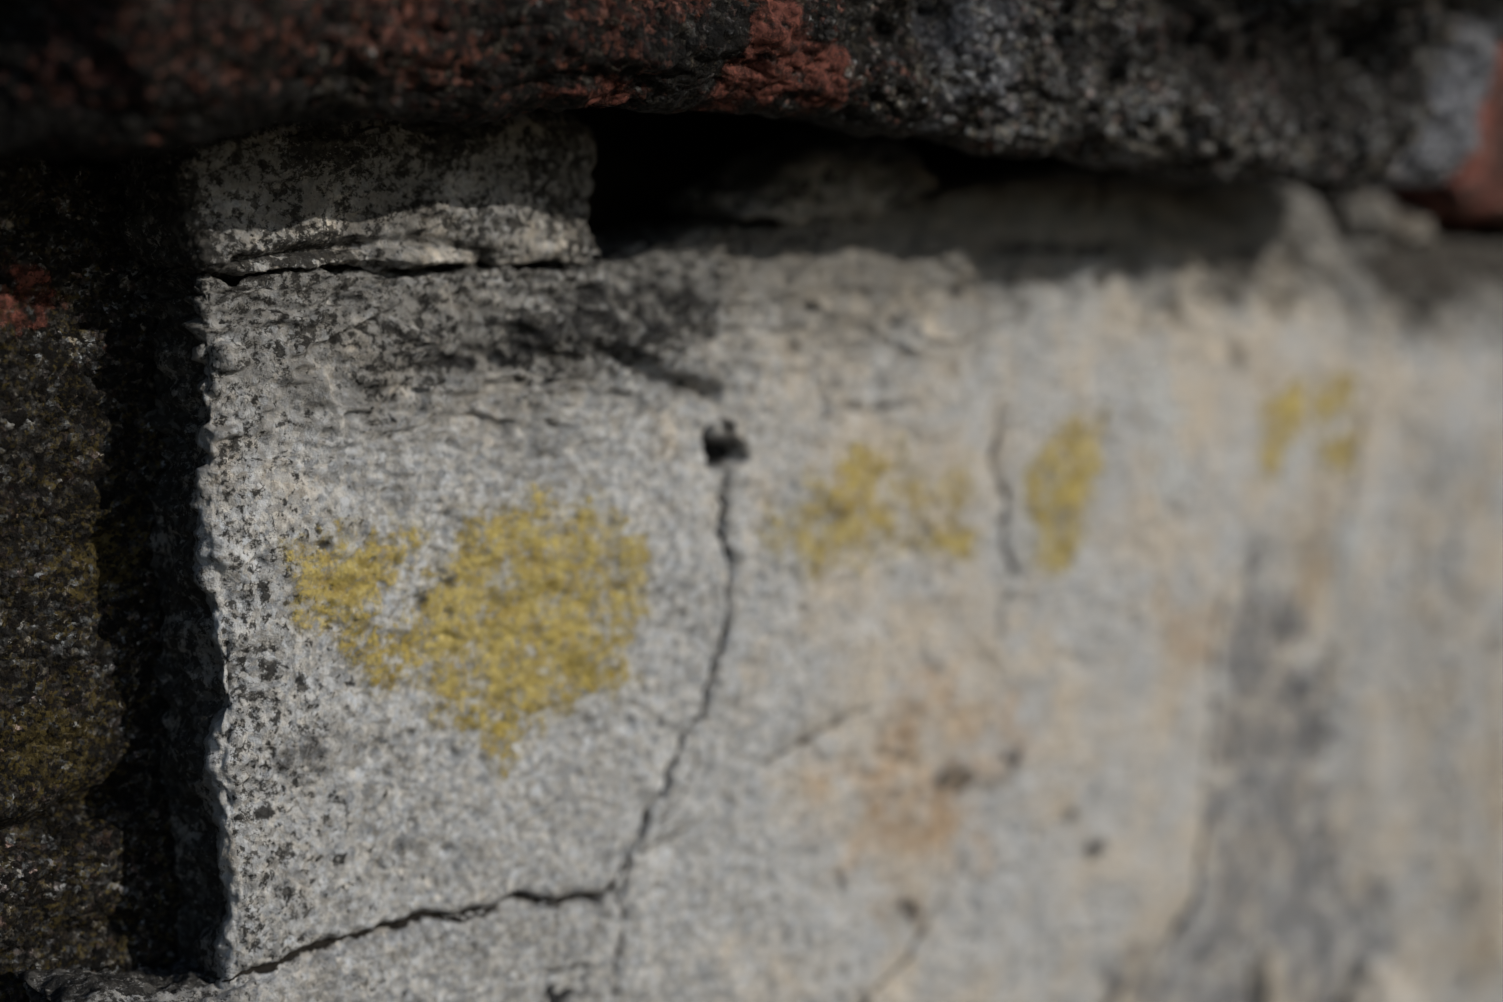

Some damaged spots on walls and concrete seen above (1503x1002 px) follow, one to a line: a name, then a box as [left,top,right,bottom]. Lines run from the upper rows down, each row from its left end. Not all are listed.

crack [205,465,731,998]